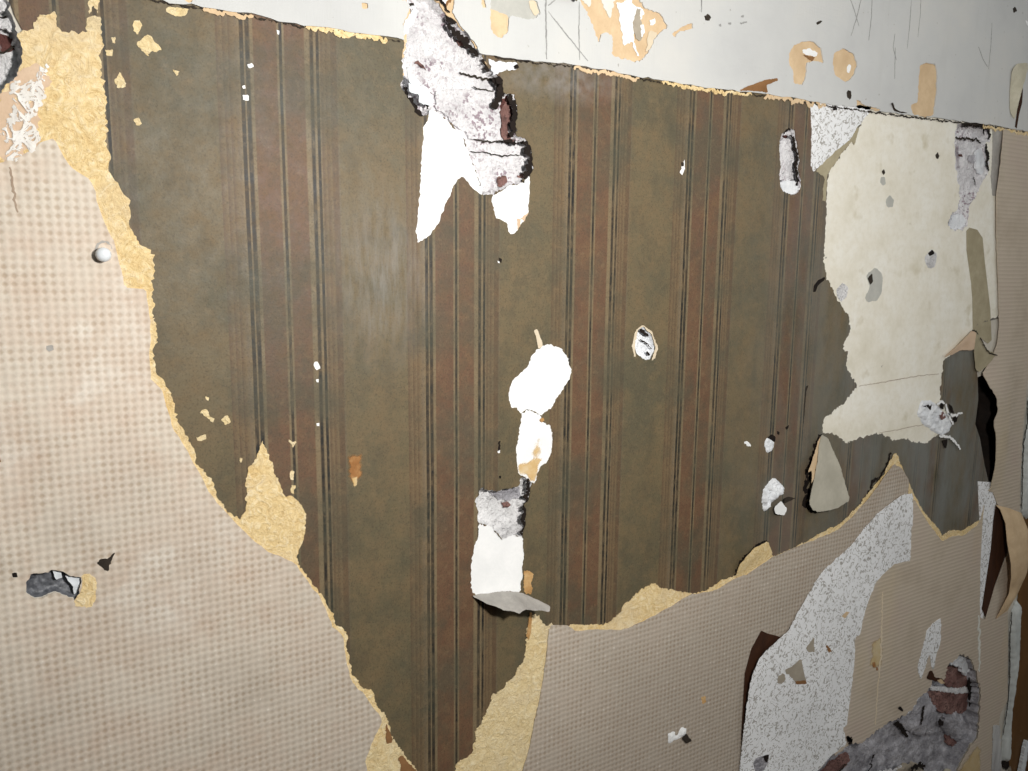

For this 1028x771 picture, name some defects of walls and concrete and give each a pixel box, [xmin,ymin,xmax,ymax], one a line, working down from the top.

spalling [0,0,22,93]
peeling [789,41,856,84]
spalling [400,0,540,242]
spalling [779,128,801,195]
flaking render [822,63,999,450]
flaking render [470,329,572,595]
spalling [975,375,998,482]